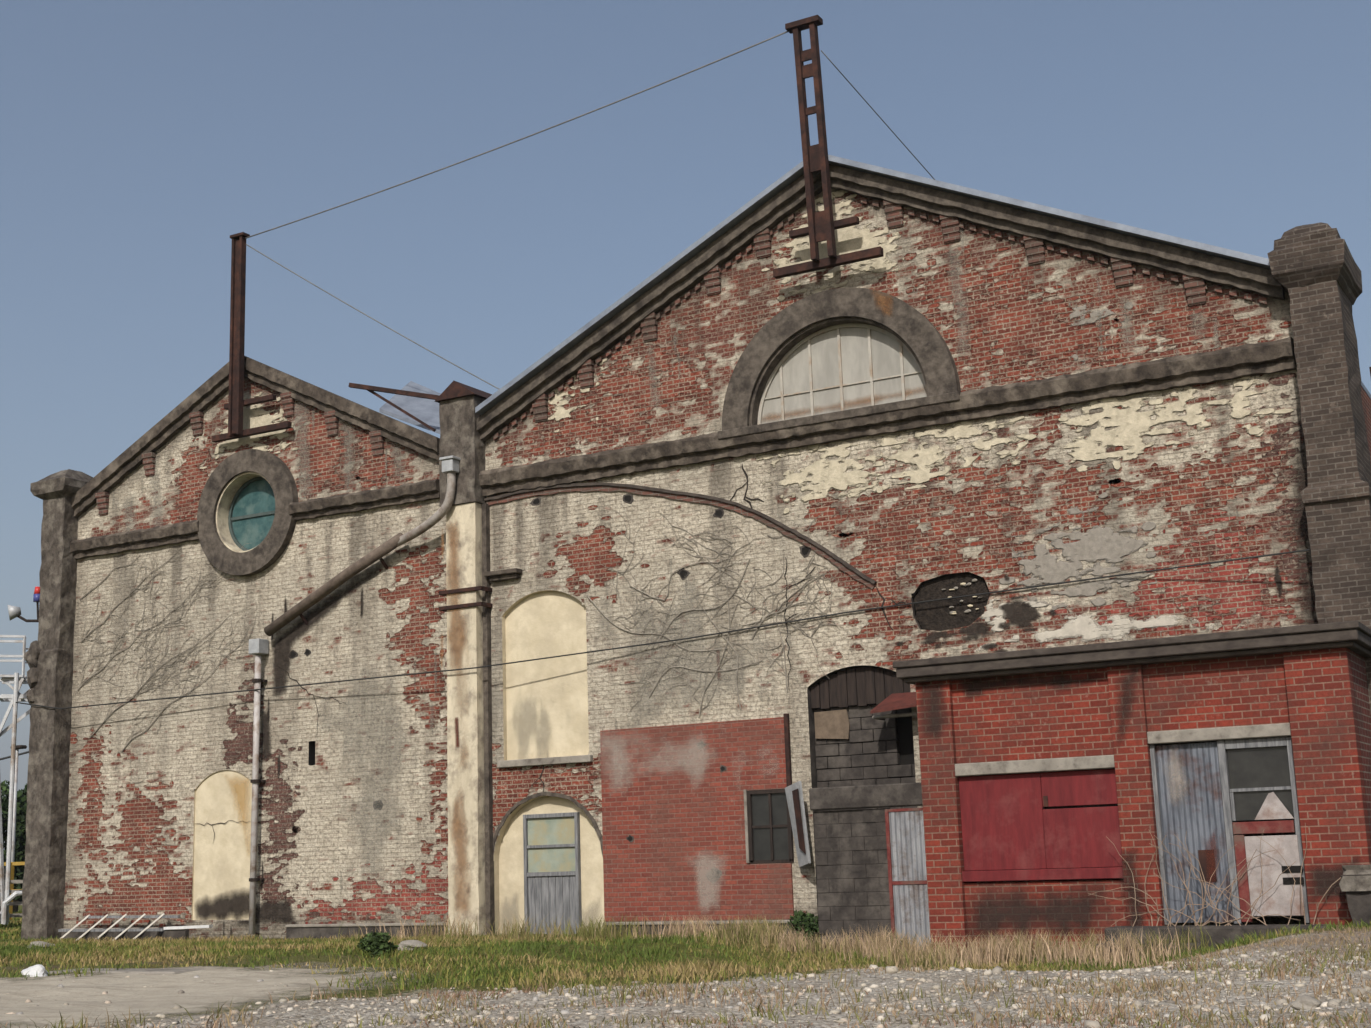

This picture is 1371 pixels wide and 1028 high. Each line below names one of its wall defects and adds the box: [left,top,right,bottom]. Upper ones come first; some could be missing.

peeling [162,390,413,524]
peeling [543,494,650,603]
peeling [495,325,714,467]
peeling [756,363,1315,667]
peeling [215,545,449,935]
leakage [963,675,1091,696]
peeling [70,725,205,936]
leakage [196,863,294,938]